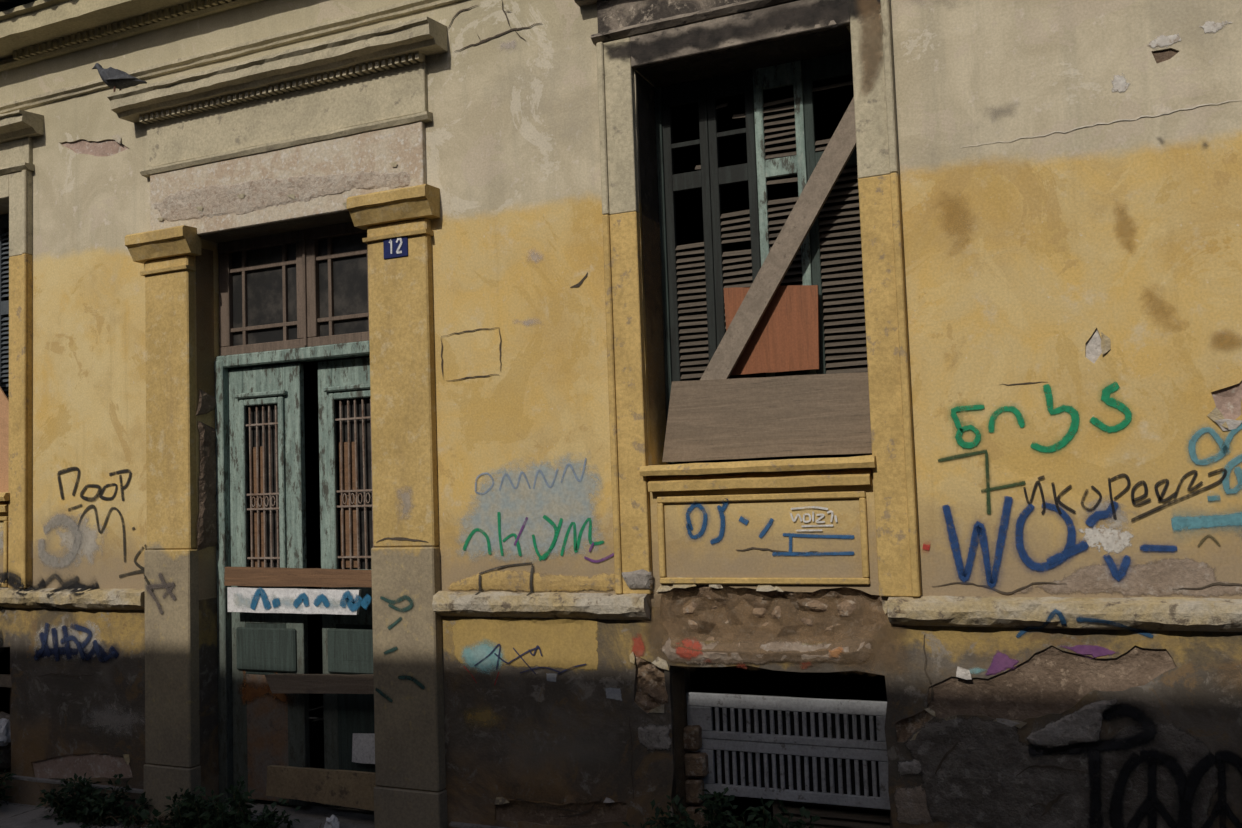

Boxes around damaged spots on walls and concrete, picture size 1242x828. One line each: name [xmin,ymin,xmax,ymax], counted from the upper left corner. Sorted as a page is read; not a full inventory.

peeling [1147,34,1181,63]
spalling [1085,328,1111,363]
spalling [1207,381,1242,431]
spalling [622,569,887,645]
spalling [895,645,1176,748]
peeling [894,759,933,825]